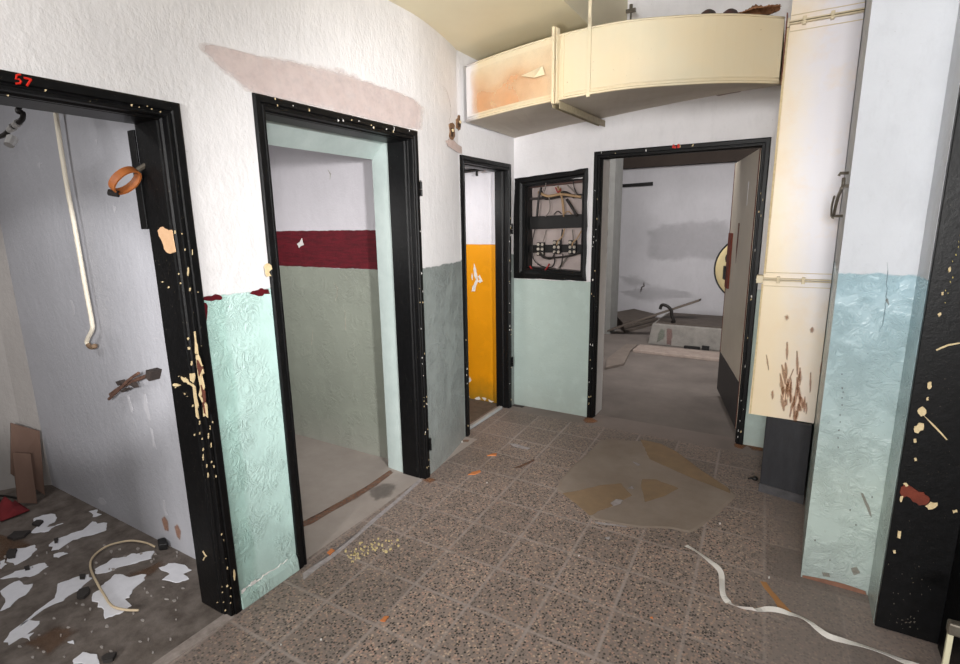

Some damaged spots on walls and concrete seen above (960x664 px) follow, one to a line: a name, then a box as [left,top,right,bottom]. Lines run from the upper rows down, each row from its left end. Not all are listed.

spalling [157,227,193,255]
crack [879,265,888,332]
peeling [173,331,217,478]
rust [772,342,822,421]
peeling [900,483,938,510]